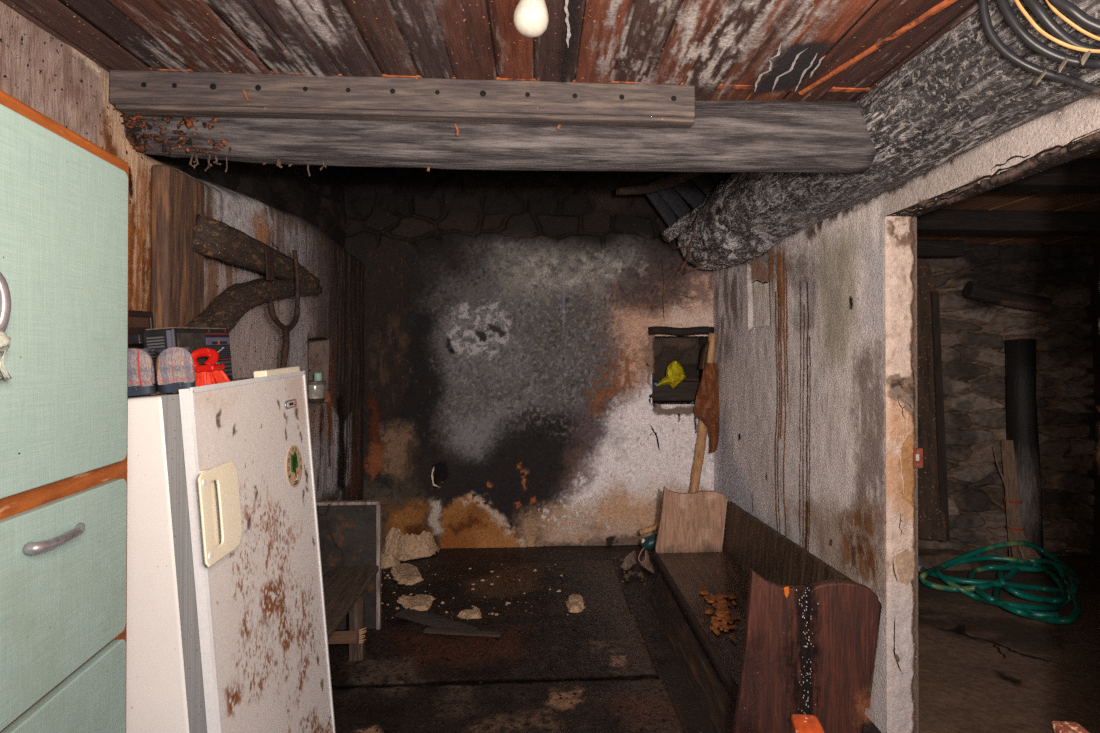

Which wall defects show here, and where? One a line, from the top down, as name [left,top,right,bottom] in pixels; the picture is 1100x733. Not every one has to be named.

mould [597,0,782,86]
water stain [748,0,838,94]
rust [128,171,151,311]
rust [325,358,336,467]
rust [364,396,384,481]
flaking render [431,462,447,488]
water stain [799,281,811,551]
water stain [386,494,526,548]
water stain [839,510,876,593]